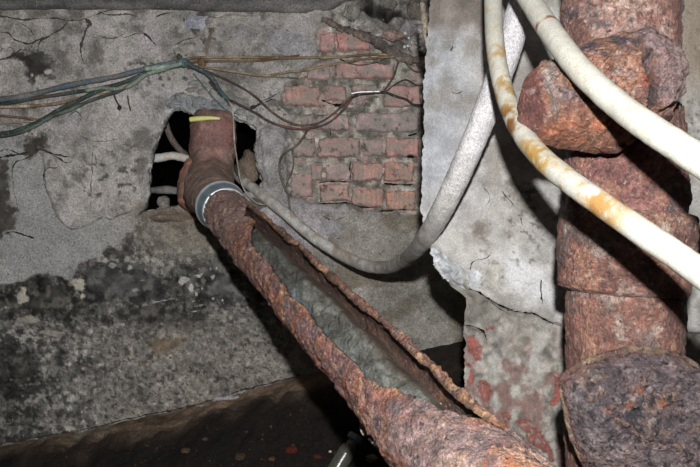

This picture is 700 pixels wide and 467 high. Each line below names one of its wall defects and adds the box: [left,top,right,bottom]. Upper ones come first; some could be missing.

crack [0,10,196,64]
spalling [319,0,425,53]
crack [0,148,71,179]
crack [69,110,123,214]
spalling [43,80,264,230]
spalling [284,61,421,211]
damp [0,278,71,324]
damp [82,261,176,326]
damp [178,256,250,304]
crack [469,280,560,326]